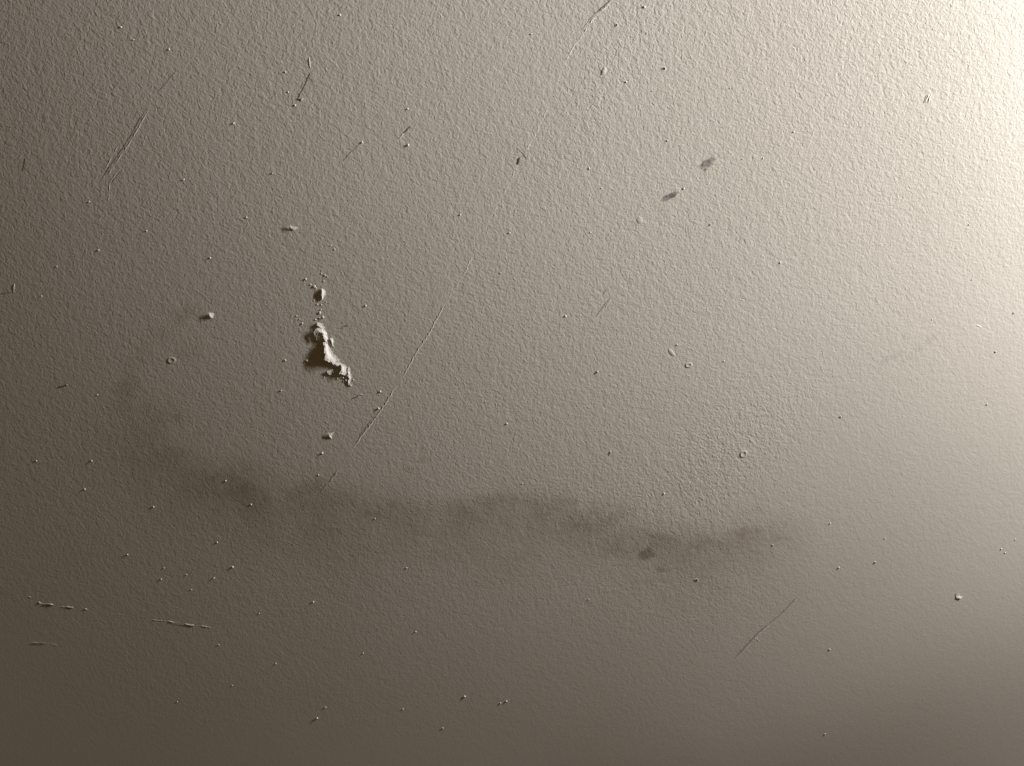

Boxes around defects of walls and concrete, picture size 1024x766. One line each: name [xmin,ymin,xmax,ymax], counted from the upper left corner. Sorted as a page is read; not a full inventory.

peeling [296,273,354,386]